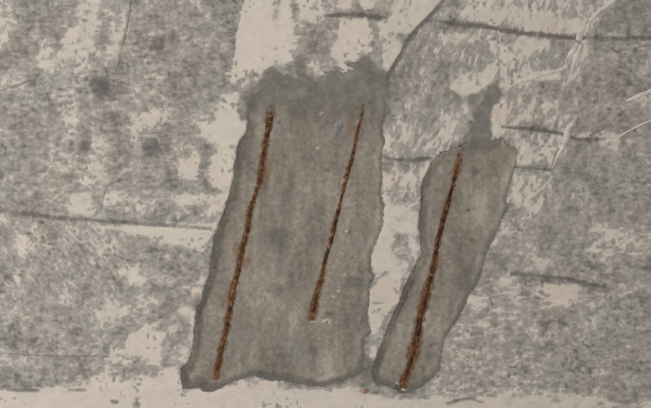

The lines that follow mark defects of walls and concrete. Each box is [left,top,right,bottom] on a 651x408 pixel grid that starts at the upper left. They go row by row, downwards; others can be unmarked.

crack [409,4,449,40]
peeling [93,58,176,155]
crack [507,127,564,135]
peeling [87,286,162,330]
peeling [106,262,181,289]
rust [213,105,275,379]
rust [308,223,336,321]
rust [400,258,438,388]
peeling [490,265,527,307]
peeling [516,237,555,272]
peeling [528,283,608,344]